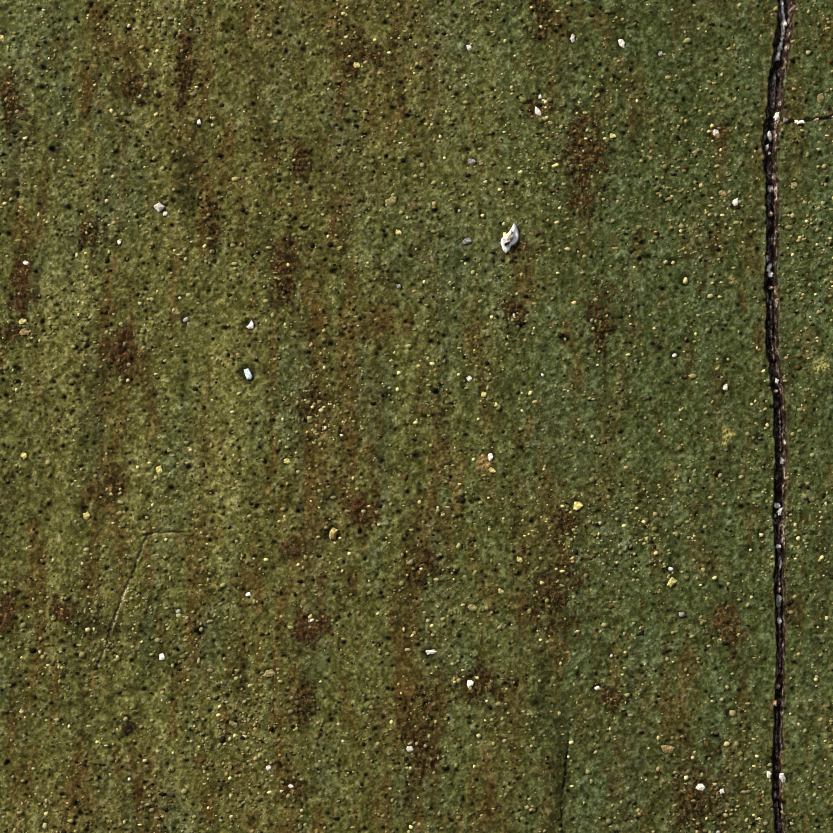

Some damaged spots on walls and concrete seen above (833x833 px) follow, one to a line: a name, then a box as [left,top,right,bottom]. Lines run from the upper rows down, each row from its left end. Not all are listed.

crack [762,0,833,833]